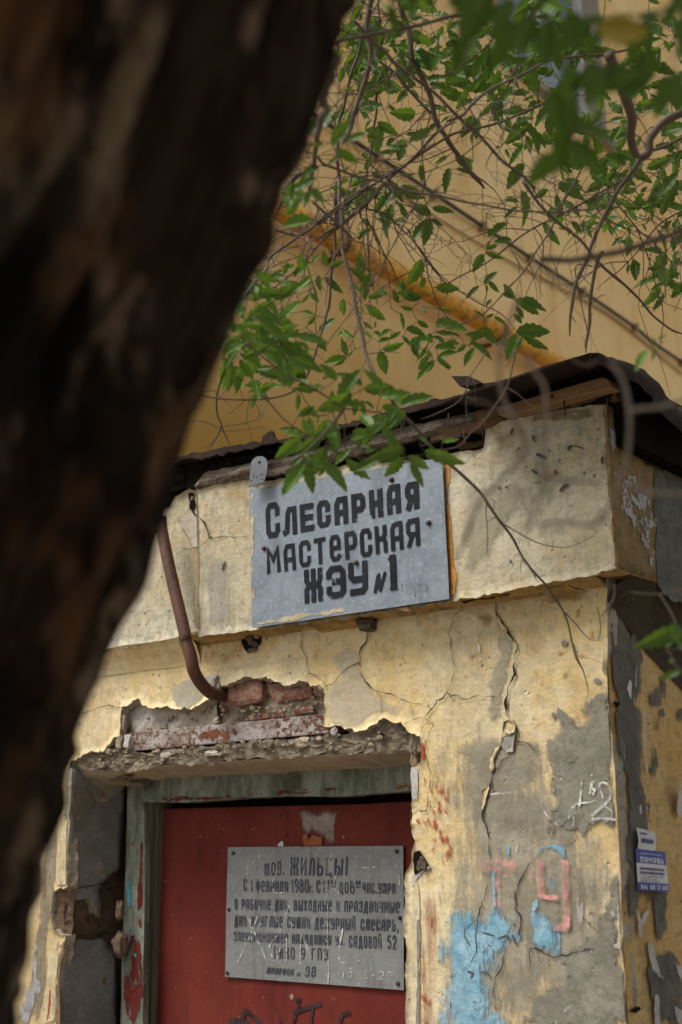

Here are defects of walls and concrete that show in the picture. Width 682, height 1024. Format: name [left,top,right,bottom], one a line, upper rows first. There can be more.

crack [176,510,246,558]
corrosion [200,728,237,741]
flaking render [86,674,352,802]
crack [282,773,302,792]
flaking render [400,731,425,801]
crack [301,592,577,962]
peeling [613,667,667,777]
flaking render [54,841,143,1024]
crack [493,861,591,1010]
peeling [610,904,621,959]
peeling [629,891,682,1024]